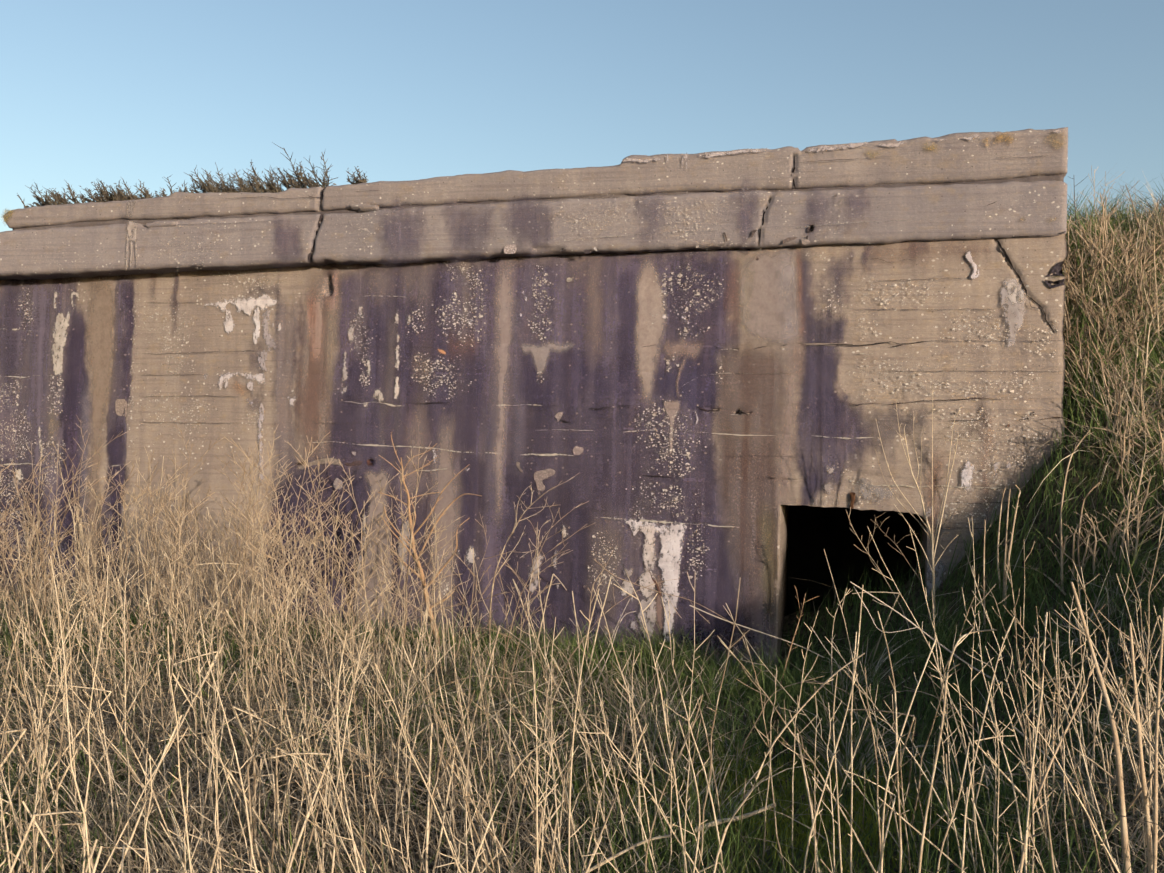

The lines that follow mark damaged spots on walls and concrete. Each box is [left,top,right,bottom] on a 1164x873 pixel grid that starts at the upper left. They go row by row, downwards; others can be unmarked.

crack [230,187,325,262]
crack [759,156,889,240]
crack [872,258,970,281]
crack [859,305,1000,313]
crack [997,231,1066,342]
water stain [0,199,137,586]
water stain [204,198,907,656]
crack [714,340,1062,421]